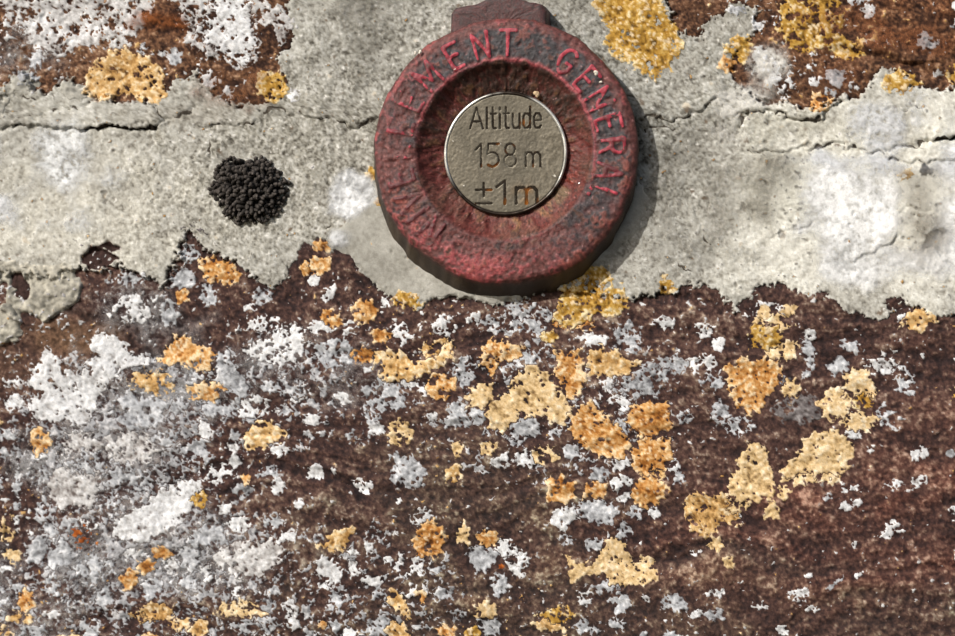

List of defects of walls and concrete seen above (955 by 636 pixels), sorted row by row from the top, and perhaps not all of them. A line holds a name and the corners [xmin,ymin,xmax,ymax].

crack [13,95,287,159]
crack [317,117,379,129]
crack [640,97,716,133]
crack [739,100,955,163]